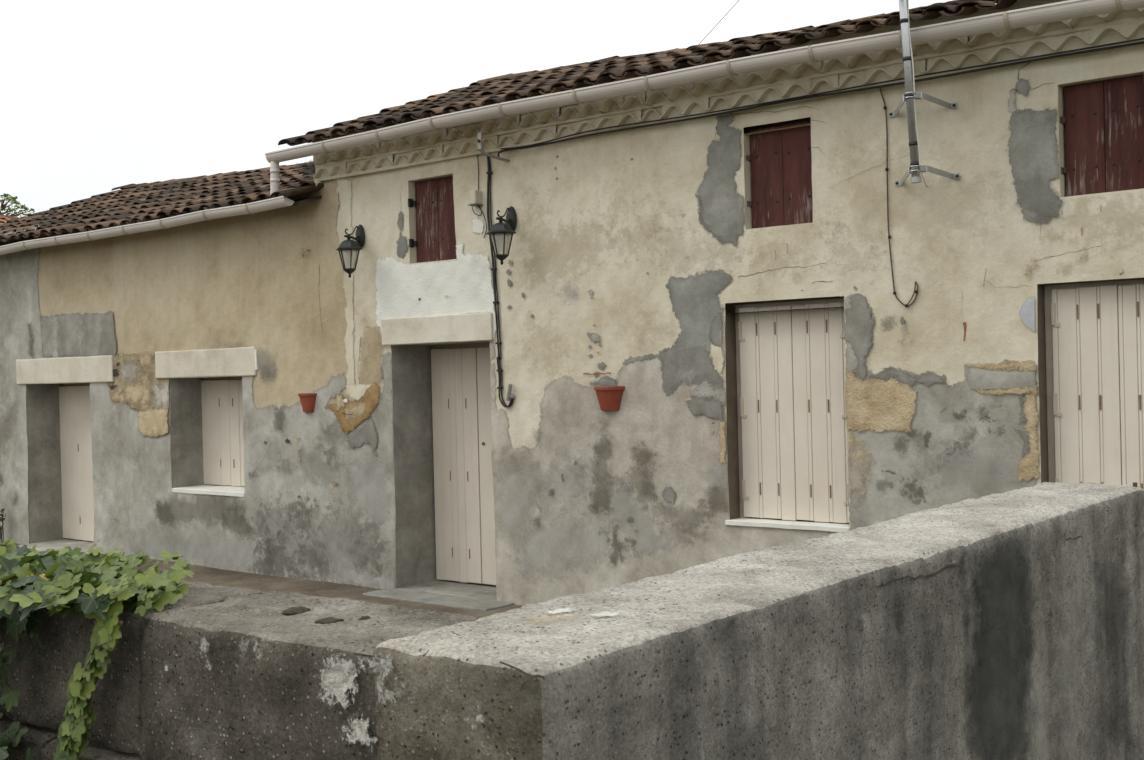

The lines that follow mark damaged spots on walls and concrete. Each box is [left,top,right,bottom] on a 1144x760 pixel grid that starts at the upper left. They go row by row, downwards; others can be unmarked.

peeling [324,178,382,433]
spalling [109,351,170,438]
water stain [685,395,724,421]
peeling [710,343,724,378]
flaking render [844,370,917,433]
flaking render [1016,390,1040,481]
water stain [540,449,660,566]
water stain [708,468,728,512]